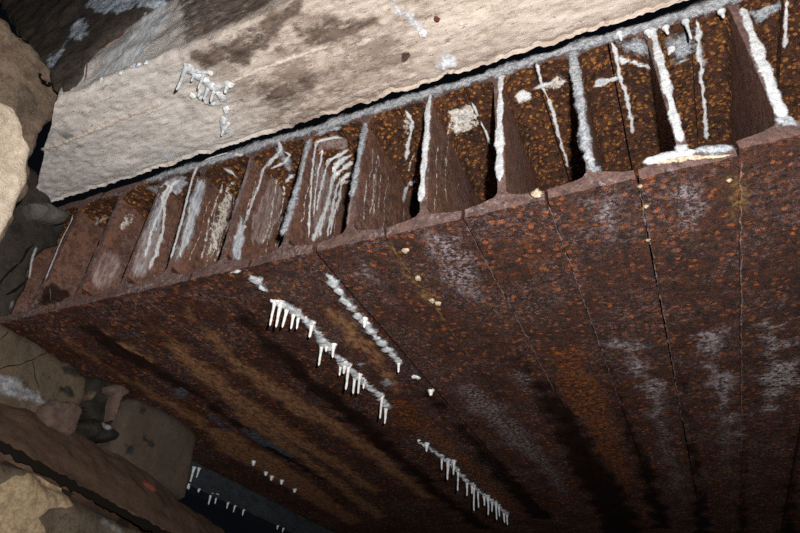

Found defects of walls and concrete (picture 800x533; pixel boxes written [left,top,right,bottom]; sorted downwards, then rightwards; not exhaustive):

water stain [133,0,796,278]
efflorescence [422,230,484,302]
rust [103,332,153,363]
water stain [80,324,310,472]
rust [115,329,434,526]
water stain [234,306,491,529]
rust [326,308,524,515]
water stain [454,425,551,519]
rust [547,345,635,491]